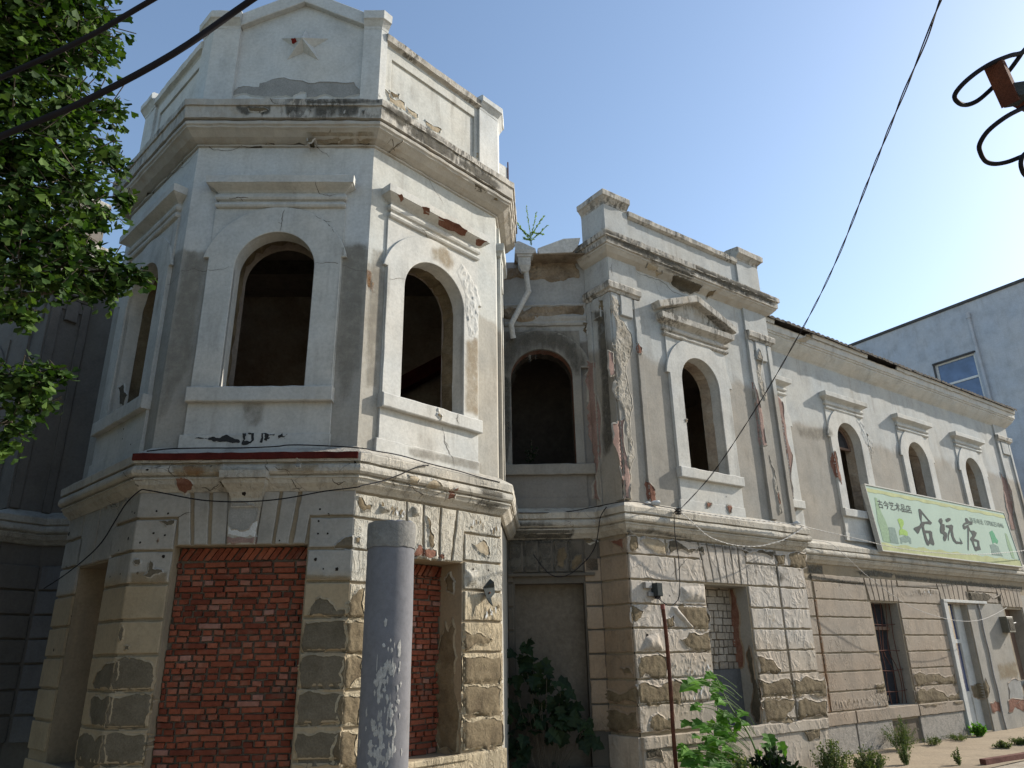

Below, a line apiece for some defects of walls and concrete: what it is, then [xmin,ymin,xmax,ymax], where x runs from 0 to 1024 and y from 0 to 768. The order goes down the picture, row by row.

peeling [233,77,360,113]
peeling [379,88,442,135]
flaking render [422,207,487,246]
spalling [645,262,716,300]
peeling [585,296,656,501]
flaking render [829,450,842,484]
peeling [227,500,261,544]
spalling [293,586,402,768]
spalling [728,588,828,742]
spalling [911,671,1024,714]